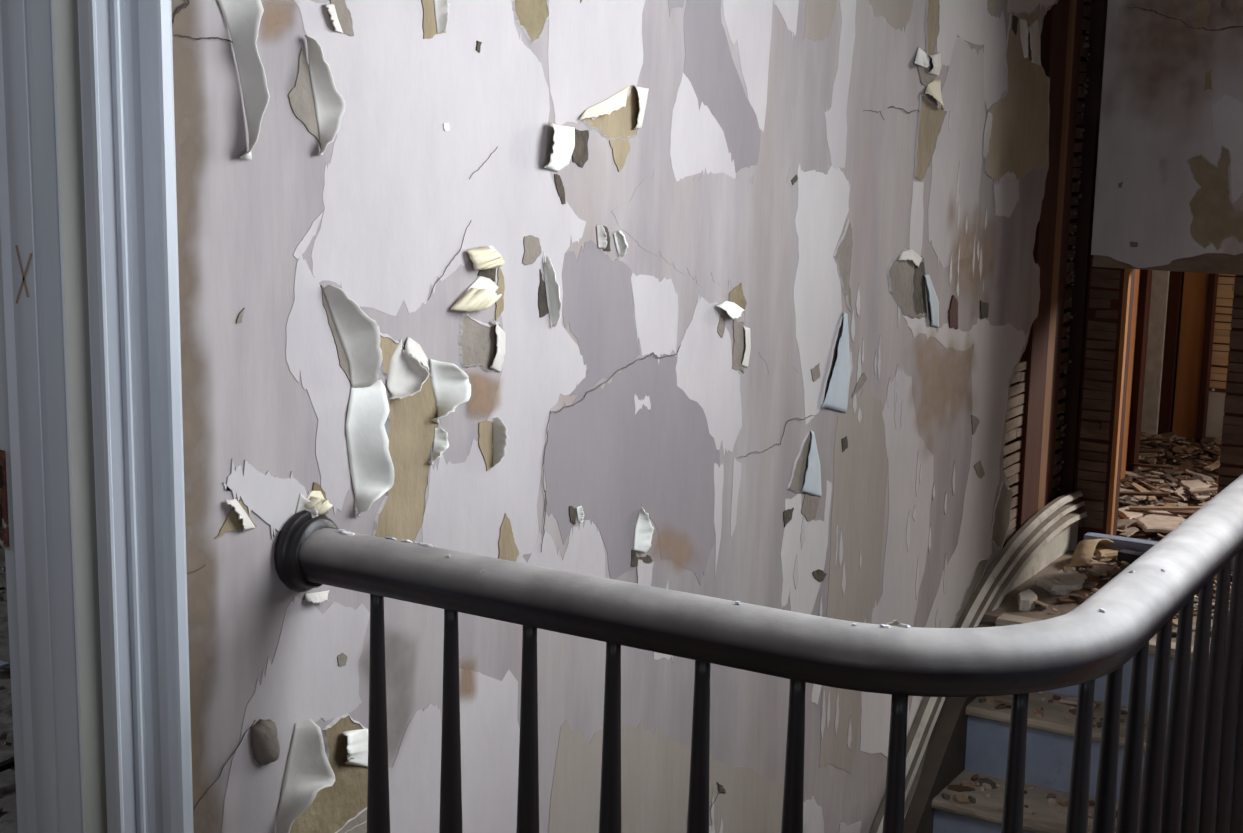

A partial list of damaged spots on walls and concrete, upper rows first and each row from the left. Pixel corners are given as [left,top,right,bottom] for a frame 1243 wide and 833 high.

crack [172,0,233,44]
peeling [215,0,1056,628]
crack [541,345,681,552]
crack [740,414,819,457]
peeling [221,590,370,833]
peeling [388,703,442,833]
peeling [459,669,520,833]
peeling [548,720,603,833]
peeling [621,721,691,833]
peeling [709,757,784,833]
peeling [803,796,824,833]
peeling [805,684,892,774]